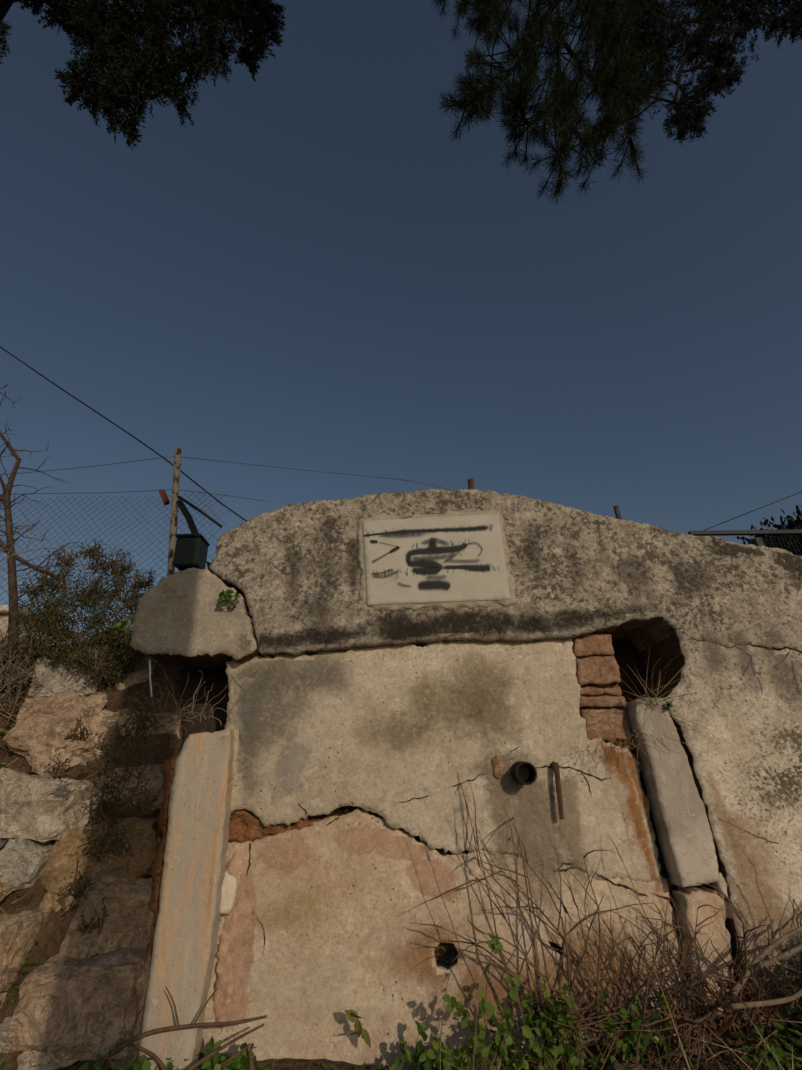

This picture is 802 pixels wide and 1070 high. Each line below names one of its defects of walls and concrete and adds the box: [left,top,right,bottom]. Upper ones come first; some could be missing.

crack [689,638,802,676]
crack [230,746,620,953]
crack [498,851,648,919]
corrosion [601,742,659,890]